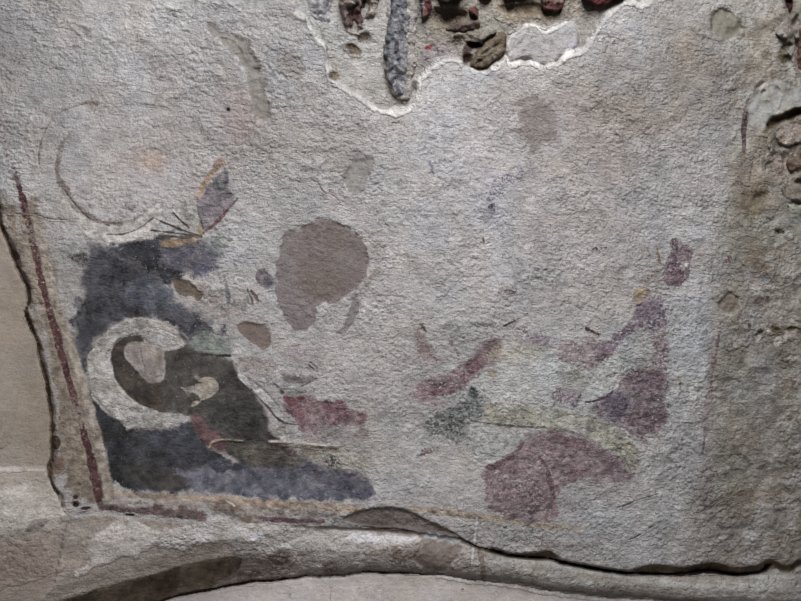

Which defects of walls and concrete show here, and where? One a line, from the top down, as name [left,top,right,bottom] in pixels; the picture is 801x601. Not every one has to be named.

flaking render [292,0,665,118]
flaking render [776,28,801,70]
flaking render [761,104,801,183]
crack [458,536,801,578]